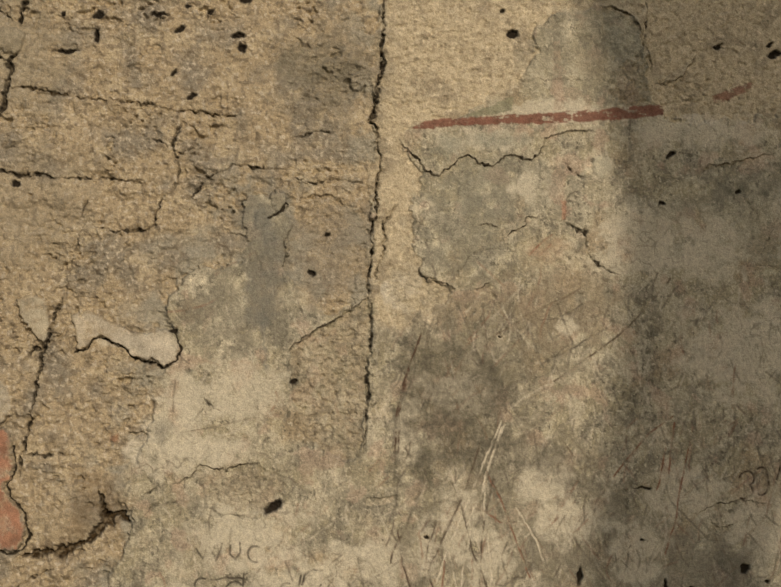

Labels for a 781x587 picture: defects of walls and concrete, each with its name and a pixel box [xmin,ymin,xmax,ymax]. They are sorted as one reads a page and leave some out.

crack [0,0,399,477]